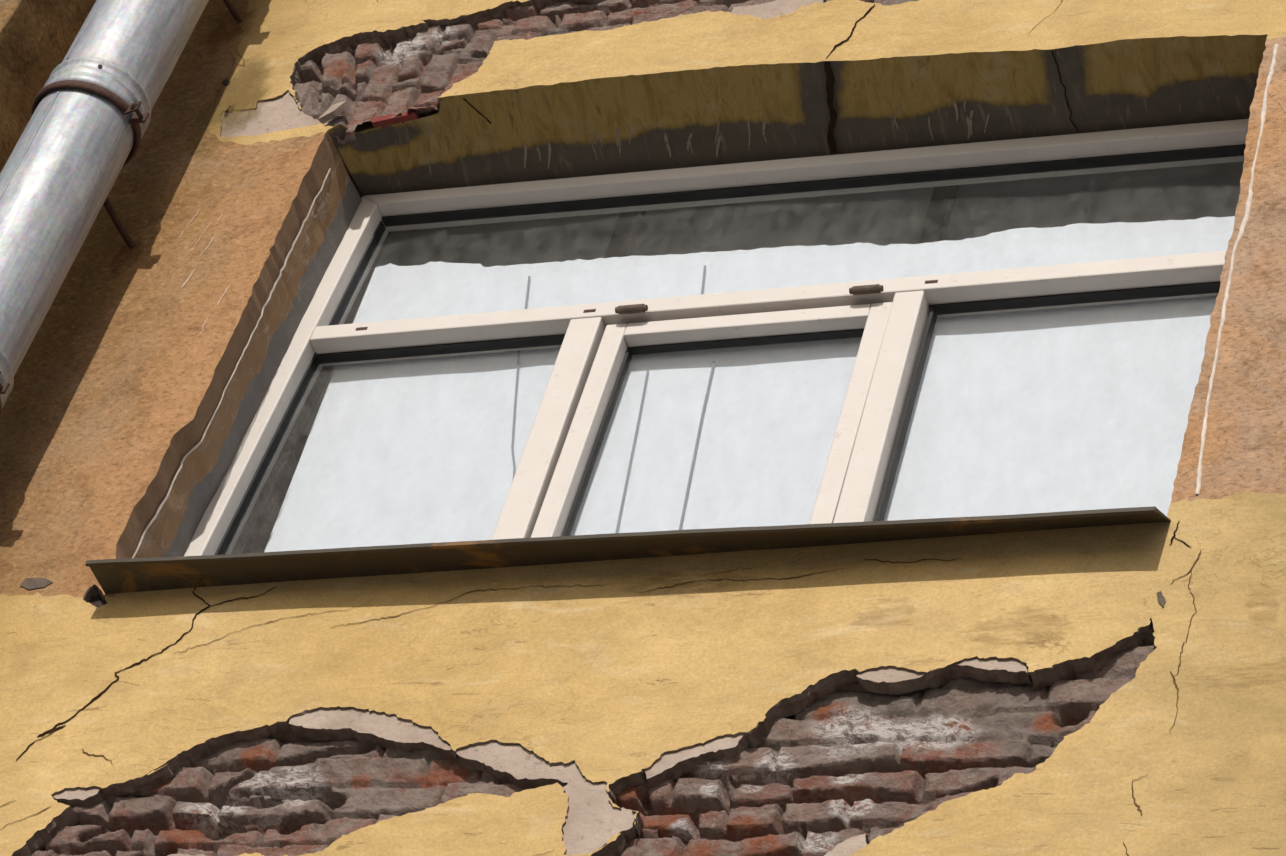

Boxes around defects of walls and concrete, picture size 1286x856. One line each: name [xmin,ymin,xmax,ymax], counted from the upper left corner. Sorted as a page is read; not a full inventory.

flaking render [221,0,831,145]
peeling [20,577,53,591]
flaking render [89,594,107,607]
crack [16,584,600,764]
crack [642,557,962,593]
crack [1170,521,1201,733]
flaking render [31,642,1155,856]
crack [1132,775,1147,815]